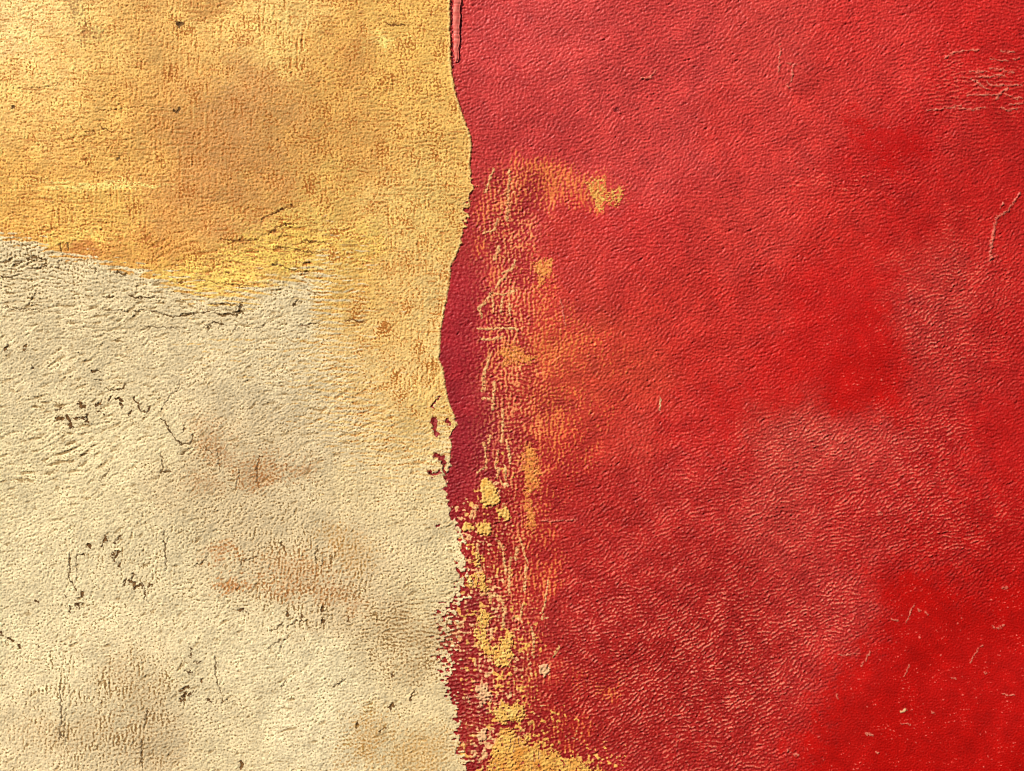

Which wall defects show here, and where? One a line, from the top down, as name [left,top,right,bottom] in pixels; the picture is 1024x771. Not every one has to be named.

peeling [483,169,511,234]
peeling [584,175,625,212]
peeling [430,396,451,437]
peeling [427,453,449,483]
peeling [462,257,560,677]
peeling [466,684,605,771]